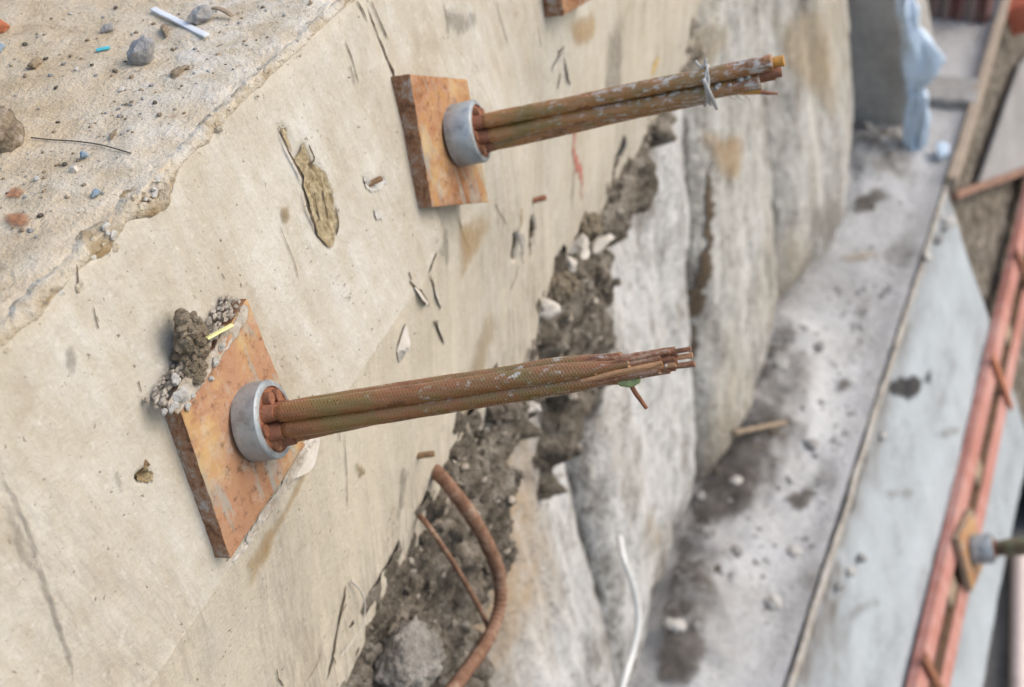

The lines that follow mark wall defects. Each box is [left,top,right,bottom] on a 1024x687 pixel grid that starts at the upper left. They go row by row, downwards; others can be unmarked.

spalling [0,0,355,354]
peeling [511,219,534,263]
peeling [409,253,445,343]
peeling [396,324,410,363]
spalling [417,464,508,687]